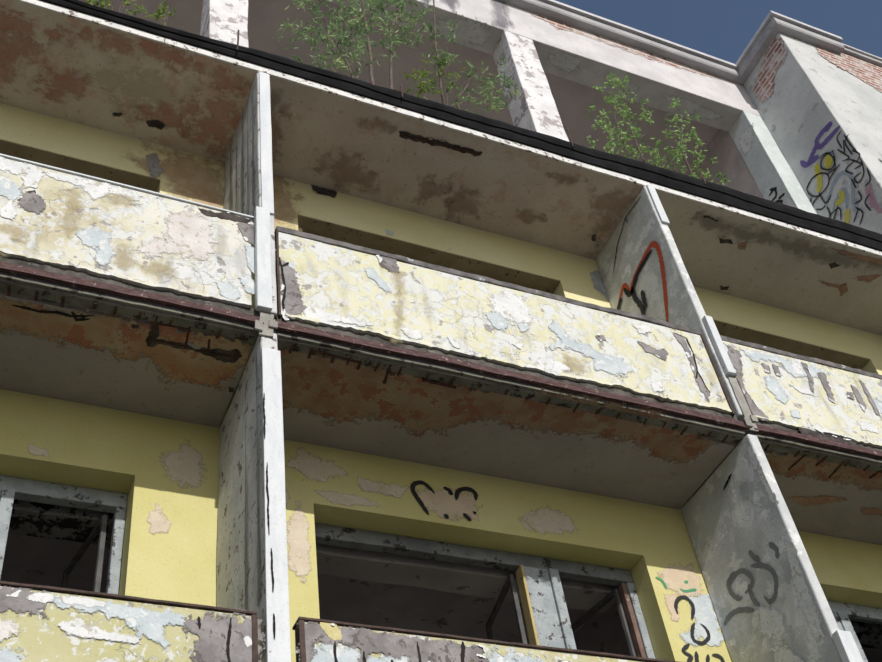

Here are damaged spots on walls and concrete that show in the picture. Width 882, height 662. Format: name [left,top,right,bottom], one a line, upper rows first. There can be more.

flaking render [753,37,787,103]
flaking render [816,46,882,92]
spalling [399,131,483,157]
peeling [0,156,143,220]
peeling [0,205,259,316]
peeling [275,249,738,464]
peeling [723,343,882,452]
peeling [747,444,882,504]
peeling [285,490,312,583]
spalling [0,584,266,662]
spalling [296,621,568,662]
peeling [783,535,825,642]